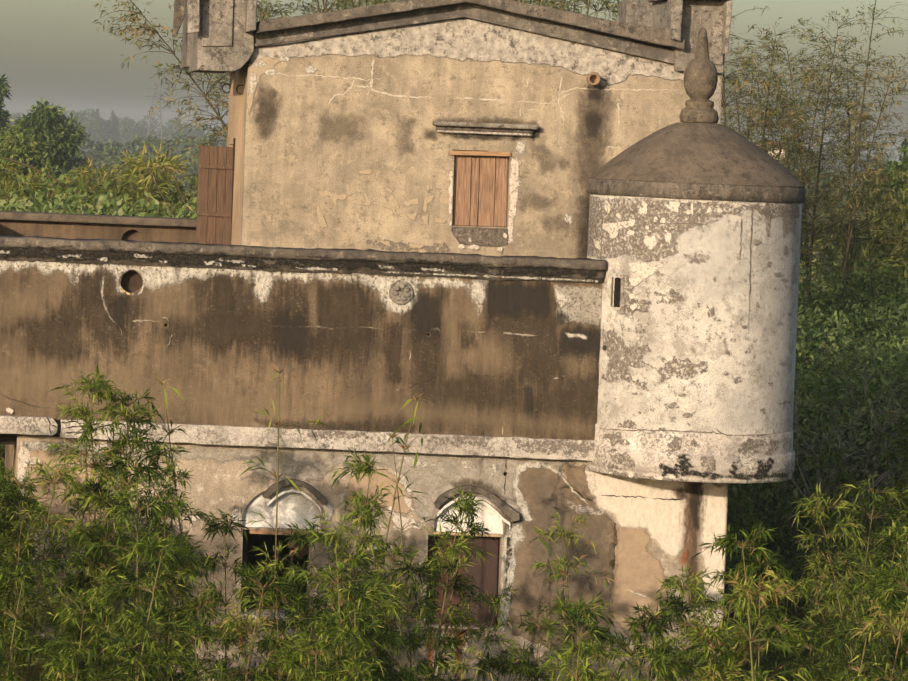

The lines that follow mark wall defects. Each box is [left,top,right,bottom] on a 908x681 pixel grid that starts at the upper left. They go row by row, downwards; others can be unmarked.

water stain [255,88,278,137]
crack [271,58,432,108]
peeling [250,18,684,86]
water stain [439,86,609,258]
crack [455,77,681,148]
peeling [587,196,800,316]
crack [739,207,753,330]
water stain [0,246,635,469]
water stain [659,436,788,480]
peeling [17,441,689,652]
corrosion [674,482,703,605]
peeling [700,483,727,646]